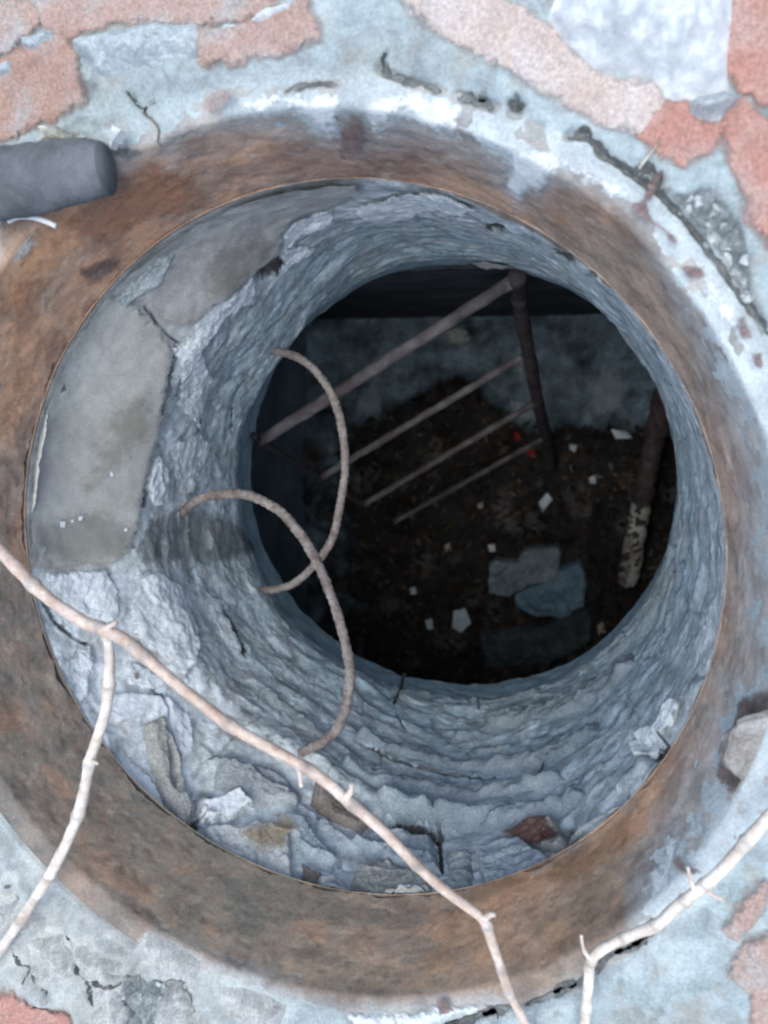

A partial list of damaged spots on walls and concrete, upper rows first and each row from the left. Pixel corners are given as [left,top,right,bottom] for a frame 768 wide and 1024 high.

spalling [256,256,284,277]
rust [632,171,677,245]
crack [568,125,768,335]
rust [682,266,704,278]
spalling [664,189,753,304]
rust [752,353,763,369]
peeling [618,502,651,588]
spalling [389,824,444,846]
rust [504,815,560,844]
crack [12,953,48,995]
crack [66,935,136,1017]
crack [445,934,654,1024]